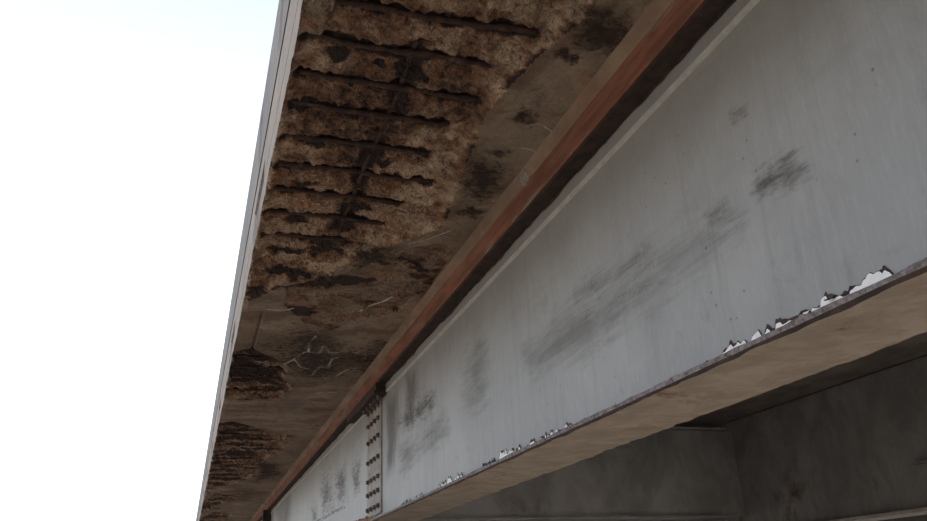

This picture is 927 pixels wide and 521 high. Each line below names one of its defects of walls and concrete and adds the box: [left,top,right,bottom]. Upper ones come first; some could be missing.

spalling [244,0,598,330]
peeling [722,265,894,354]
spalling [224,347,295,401]
crack [282,335,355,394]
spalling [199,421,291,521]